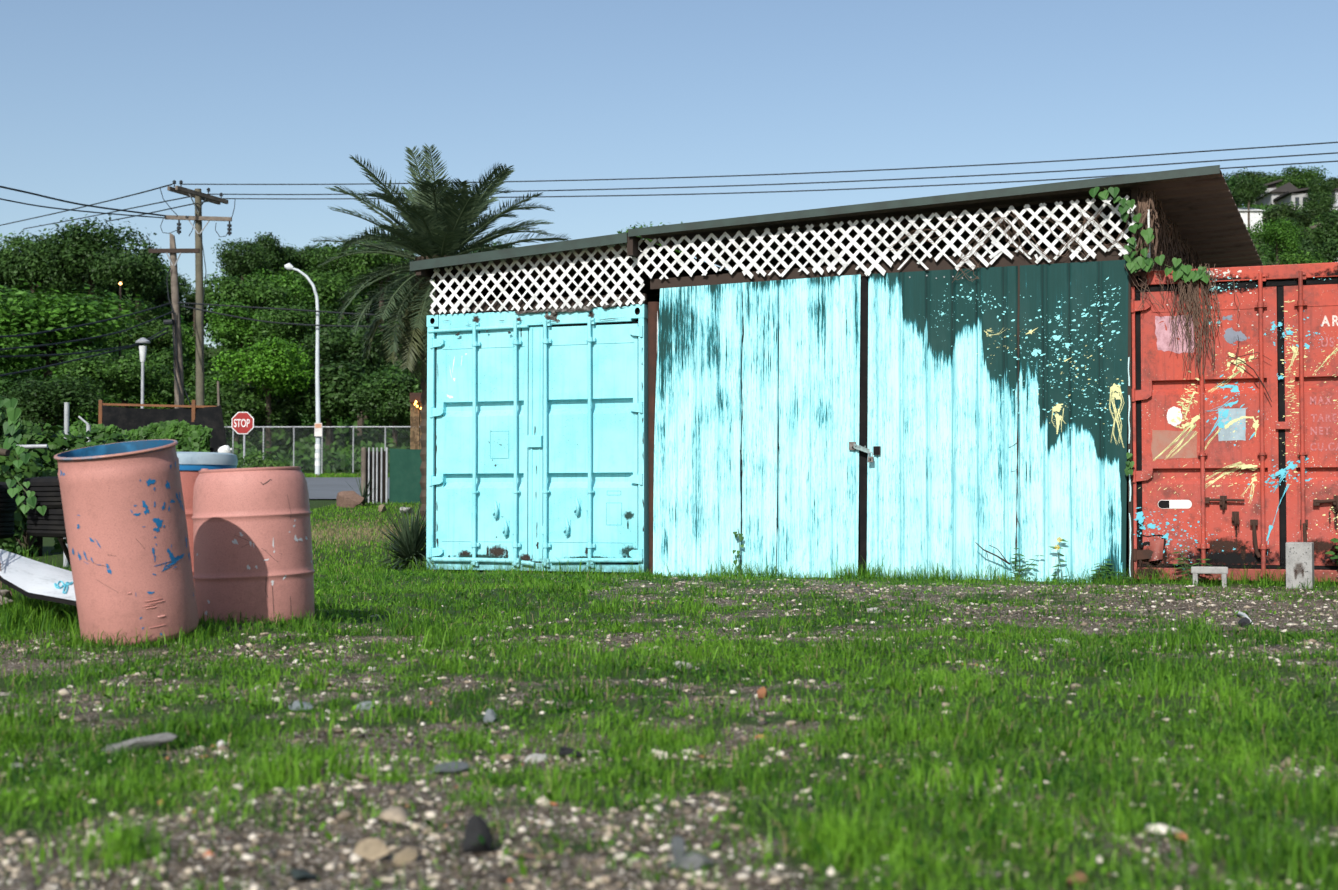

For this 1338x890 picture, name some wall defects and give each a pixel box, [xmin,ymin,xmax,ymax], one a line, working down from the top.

rust [486,545,532,561]
rust [1139,548,1174,569]
rust [1196,522,1247,561]
rust [1310,505,1338,557]